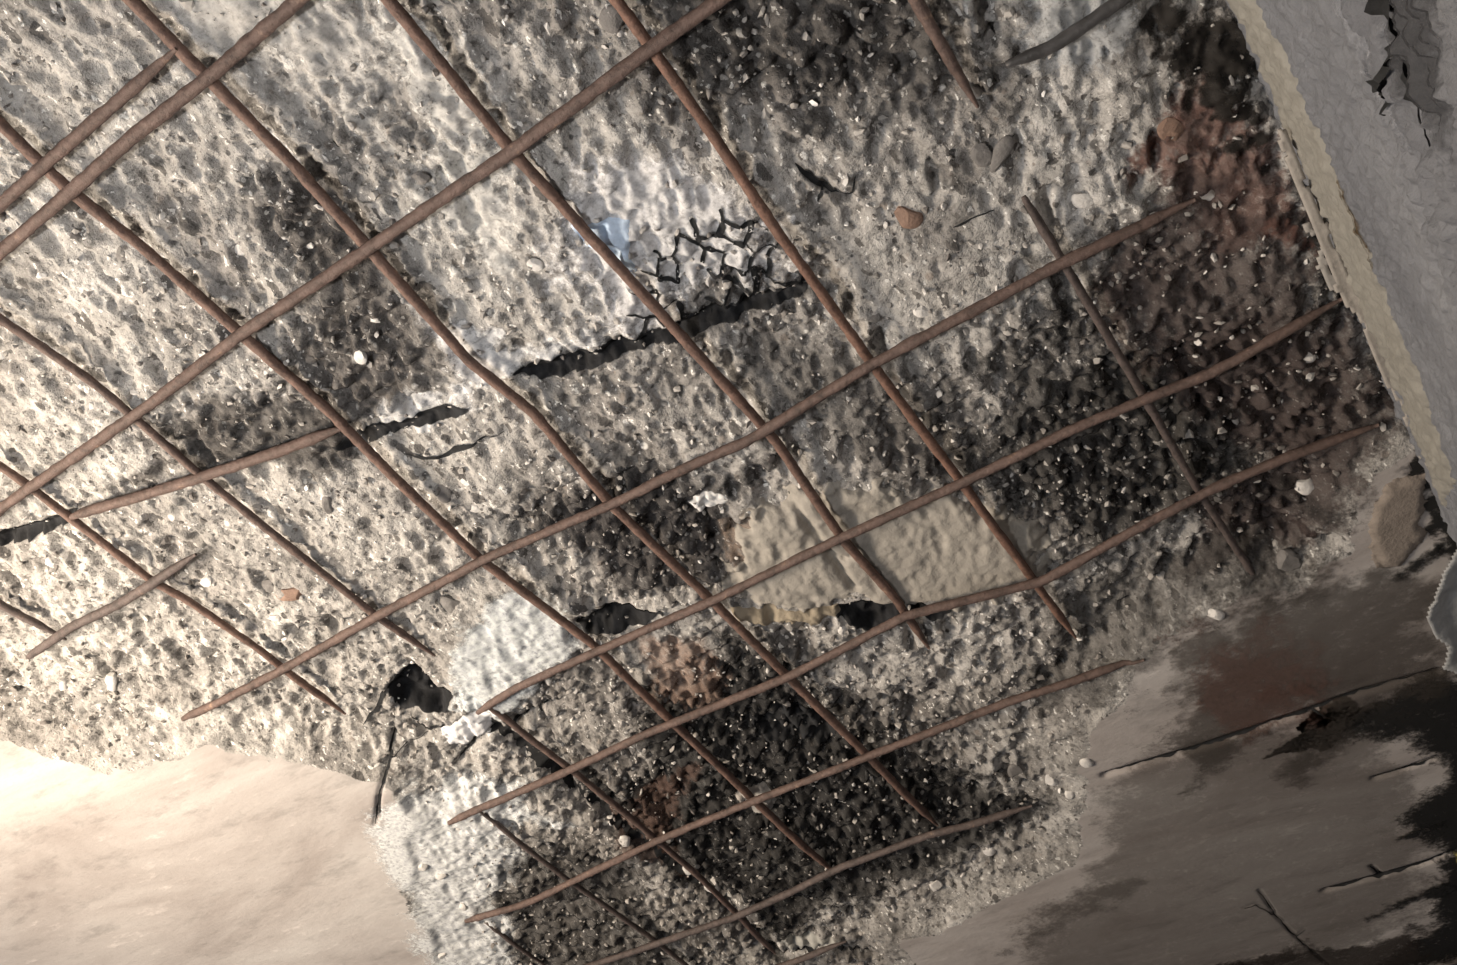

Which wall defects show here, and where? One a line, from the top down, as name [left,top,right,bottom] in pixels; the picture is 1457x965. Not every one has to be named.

leakage [1020,0,1275,157]
crack [1364,0,1431,147]
crack [333,404,504,460]
crack [513,209,807,380]
spalling [1210,264,1271,333]
corrosion [1091,76,1401,584]
spalling [1235,374,1268,399]
leakage [1296,235,1342,320]
efflorescence [448,593,580,720]
leakage [1168,455,1457,965]
leakage [553,629,1057,961]
spalling [399,864,448,935]